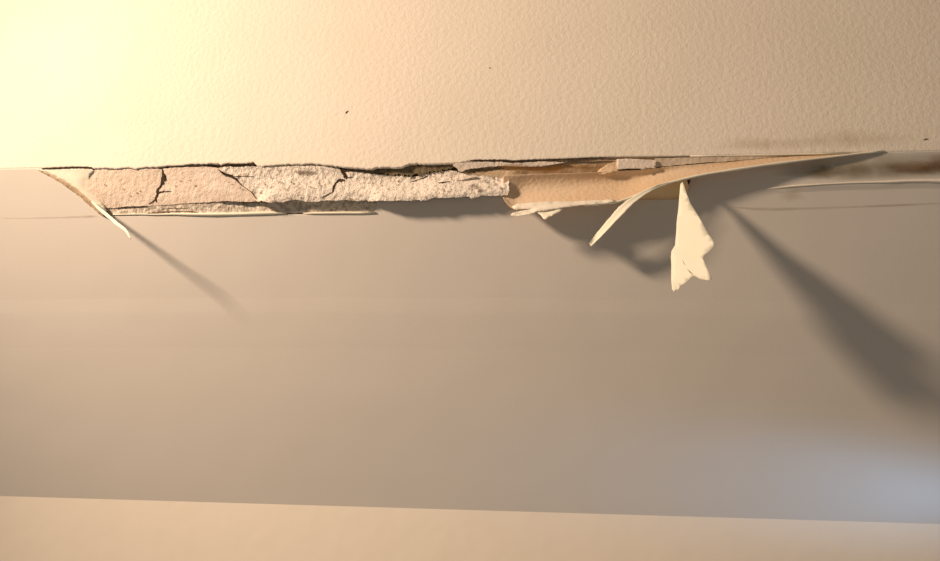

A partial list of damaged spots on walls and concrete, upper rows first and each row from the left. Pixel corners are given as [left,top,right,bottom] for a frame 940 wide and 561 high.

crack [41,157,729,214]
spalling [37,149,884,292]